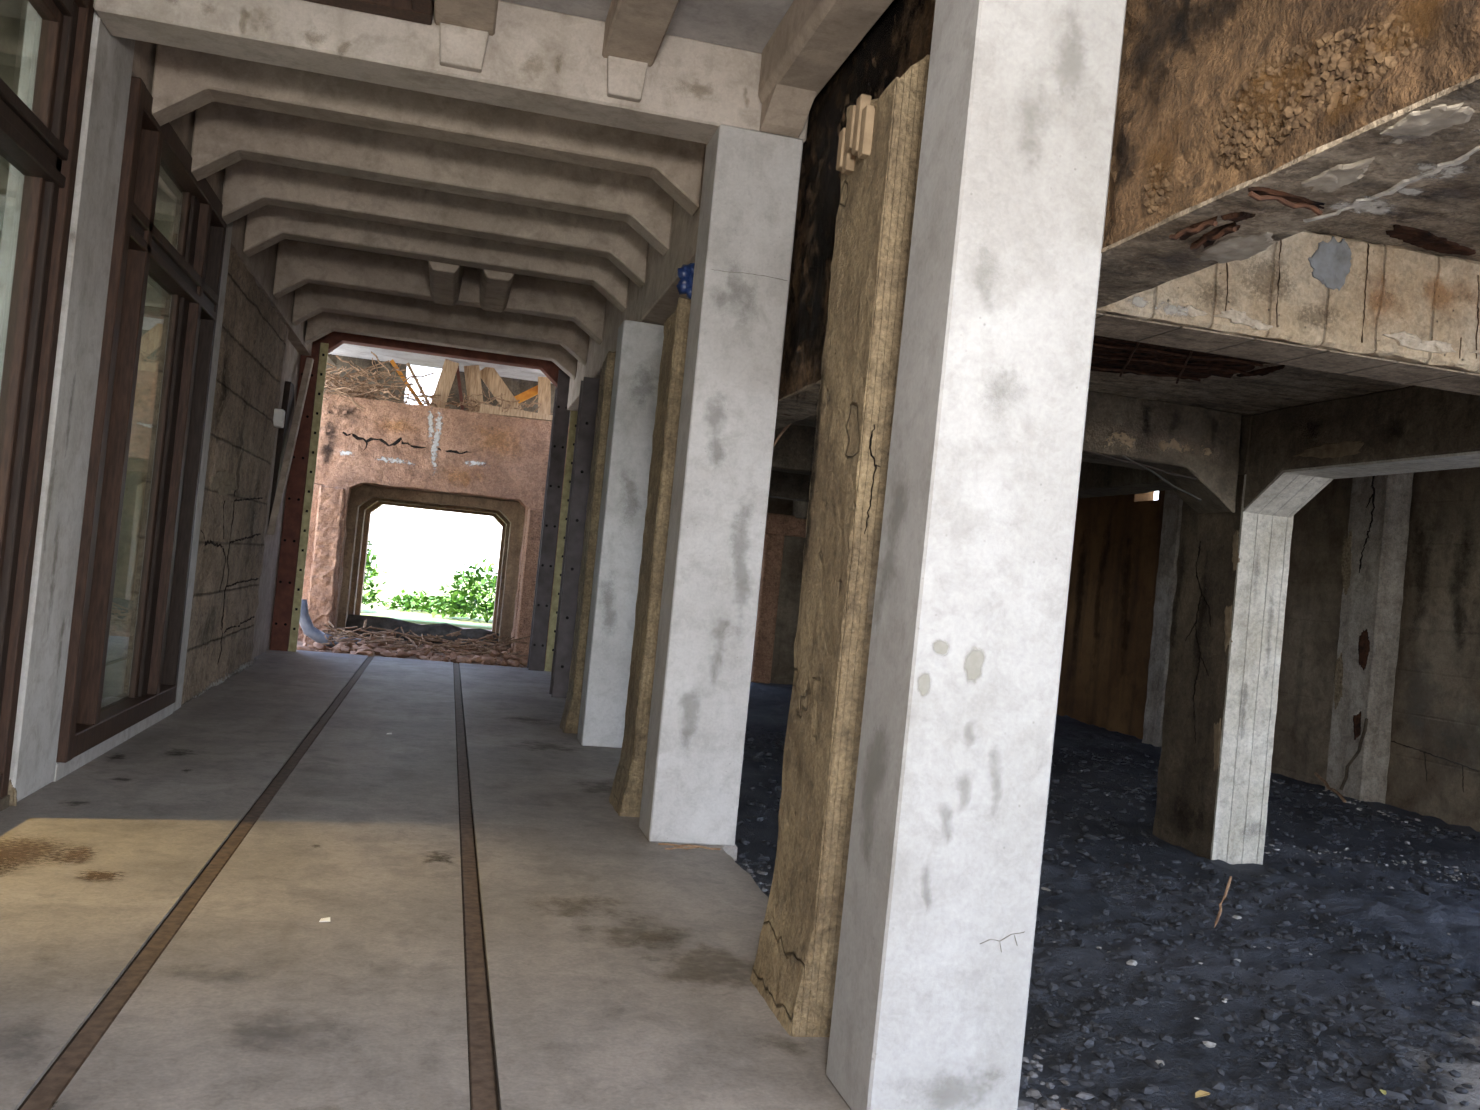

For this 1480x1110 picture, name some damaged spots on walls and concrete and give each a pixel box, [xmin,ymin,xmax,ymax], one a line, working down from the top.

peeling [1380,102,1475,145]
peeling [1169,157,1375,264]
spalling [1386,224,1476,256]
spalling [1178,305,1273,330]
spalling [1090,335,1285,384]
spalling [1383,331,1480,355]
crack [342,432,471,454]
crack [1359,476,1375,573]
crack [1185,541,1211,743]